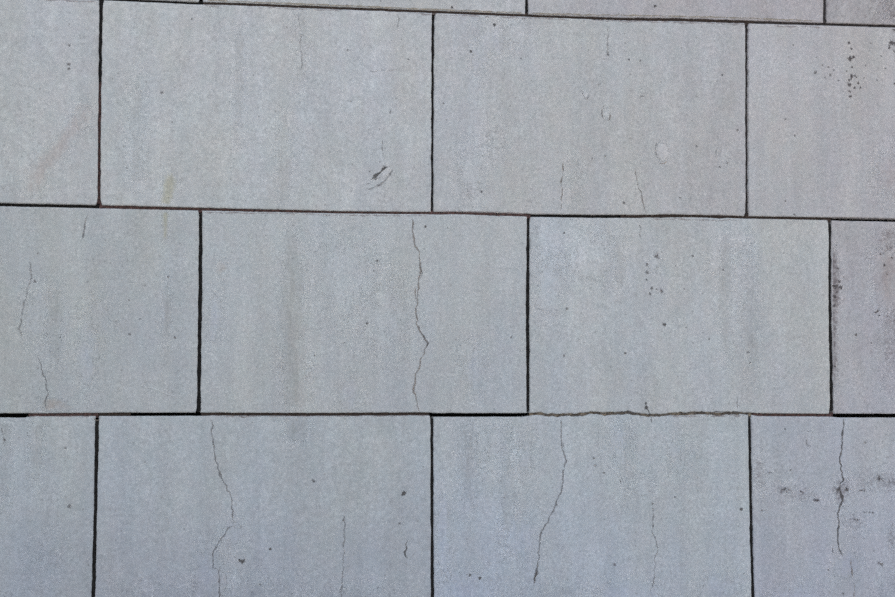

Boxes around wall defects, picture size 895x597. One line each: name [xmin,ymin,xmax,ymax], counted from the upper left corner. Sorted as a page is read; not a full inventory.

crack [412,222,429,407]
crack [211,423,234,597]
crack [533,401,747,582]
crack [832,419,854,595]